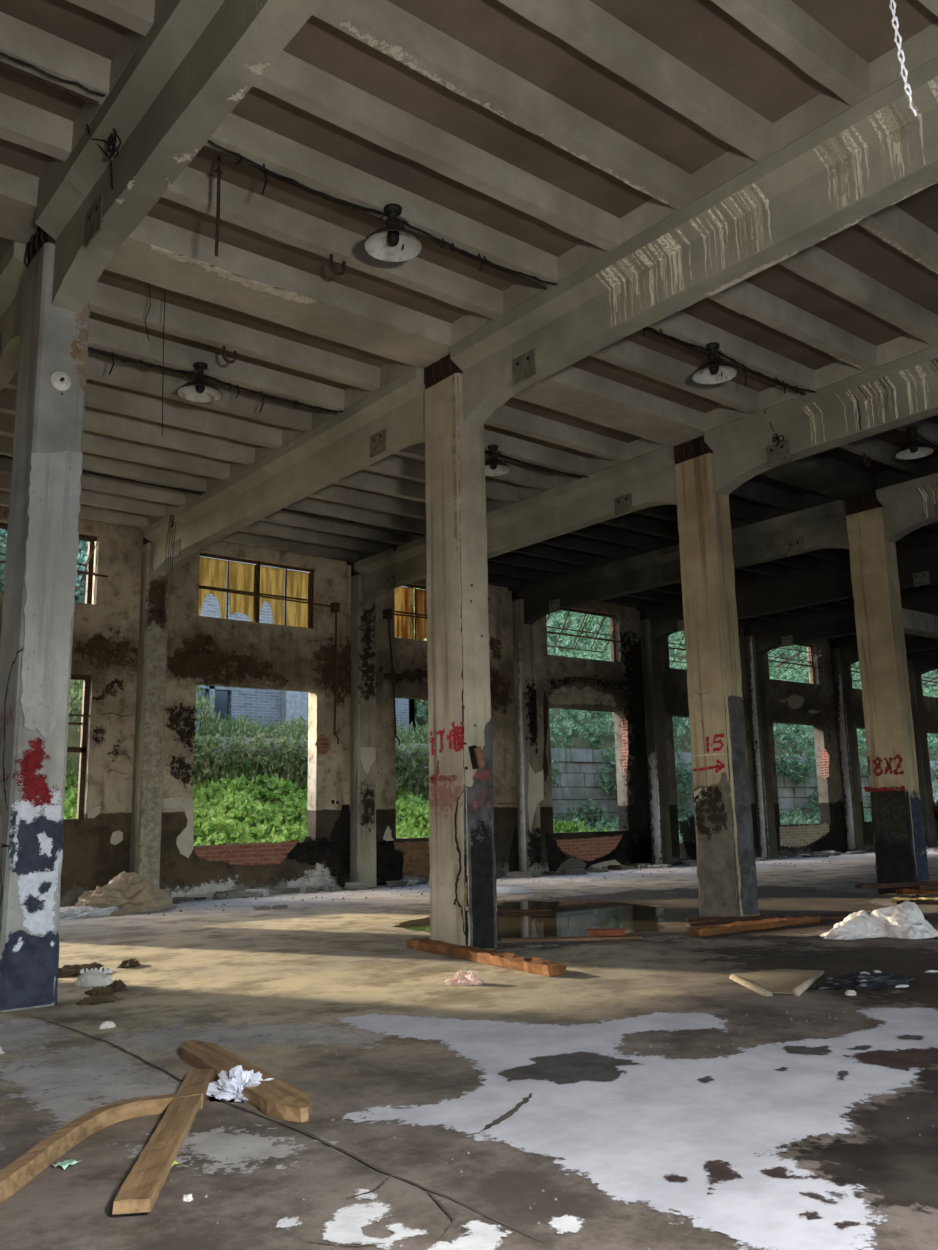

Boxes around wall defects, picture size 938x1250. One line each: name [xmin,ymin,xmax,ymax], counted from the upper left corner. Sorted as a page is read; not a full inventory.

efflorescence [596,183,771,327]
leakage [73,579,169,705]
leakage [167,633,294,689]
crack [3,647,23,809]
leakage [165,703,198,789]
flaking render [508,685,629,872]
crack [0,844,10,905]
peeling [23,881,52,914]
peeling [37,831,53,858]
peeling [0,930,59,1012]
crack [28,1014,545,1242]
crack [299,1238,386,1246]